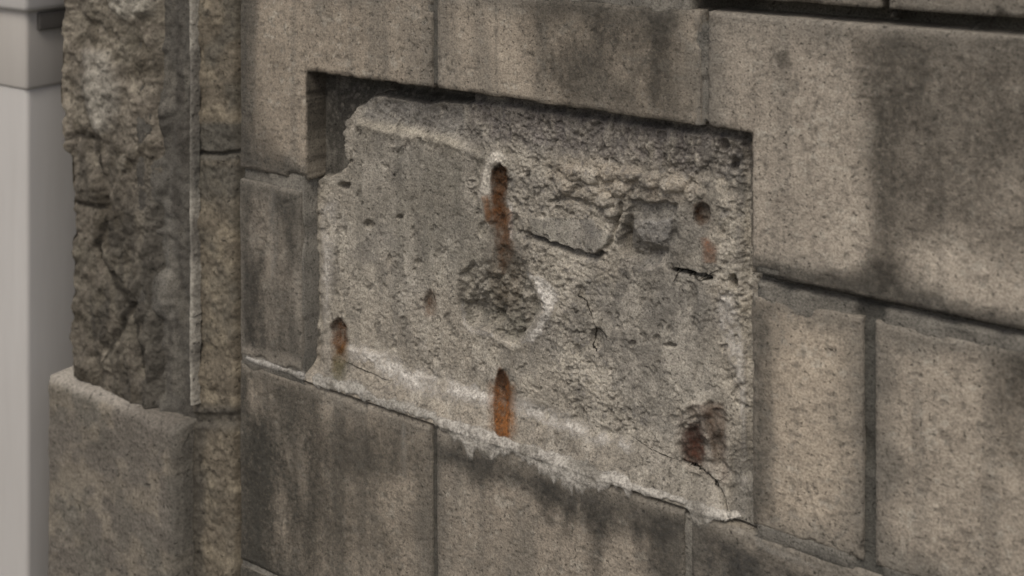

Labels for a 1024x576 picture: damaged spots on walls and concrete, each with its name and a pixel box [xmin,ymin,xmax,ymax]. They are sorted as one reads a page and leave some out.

spalling [319,73,476,179]
rust [483,163,511,252]
spalling [524,196,682,272]
rust [334,319,346,363]
spalling [455,242,545,347]
crack [578,291,607,351]
crack [671,267,721,282]
rust [492,368,513,438]
damp [240,253,768,576]
crack [634,437,728,511]
rust [683,424,704,462]
spalling [674,398,736,486]